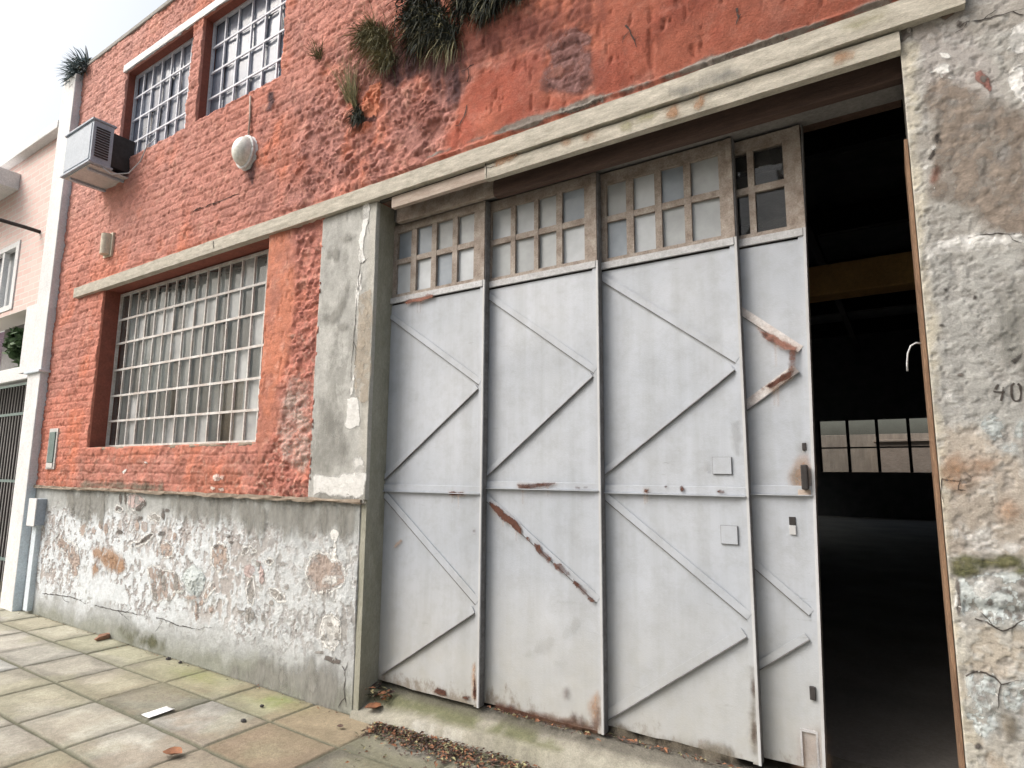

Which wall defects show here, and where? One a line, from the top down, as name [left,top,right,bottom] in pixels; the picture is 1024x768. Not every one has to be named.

flaking render [344,203,372,429]
crack [351,258,368,382]
corrosion [761,331,796,390]
peeling [313,456,366,499]
peeling [58,492,184,603]
peeling [194,535,289,624]
flaking render [305,550,346,595]
corrosion [489,502,563,573]
crack [44,593,211,630]
peeling [315,614,341,664]
crack [975,613,1024,632]
crack [966,671,1019,708]